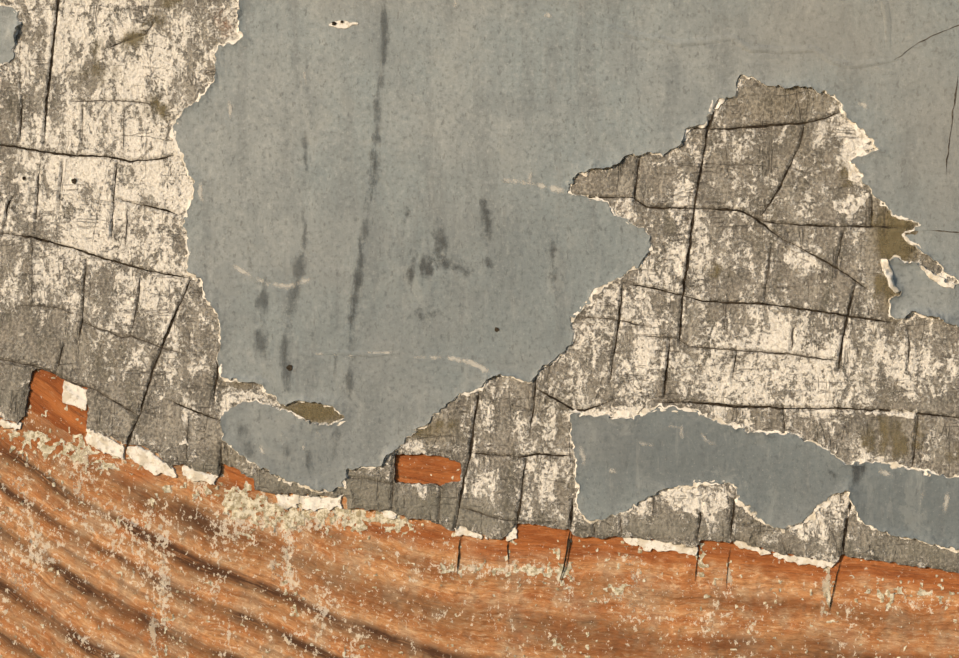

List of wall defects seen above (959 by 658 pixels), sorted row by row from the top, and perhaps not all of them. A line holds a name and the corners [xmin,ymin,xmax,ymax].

crack [0,0,191,453]
crack [530,112,959,465]
peeling [132,485,177,527]
peeling [137,581,213,658]
peeling [273,555,305,617]
crack [438,392,569,573]
peeling [491,540,580,590]
crack [560,503,595,579]
peeling [603,571,654,595]
crack [726,498,735,585]
crack [829,503,852,610]
peeling [863,574,959,611]